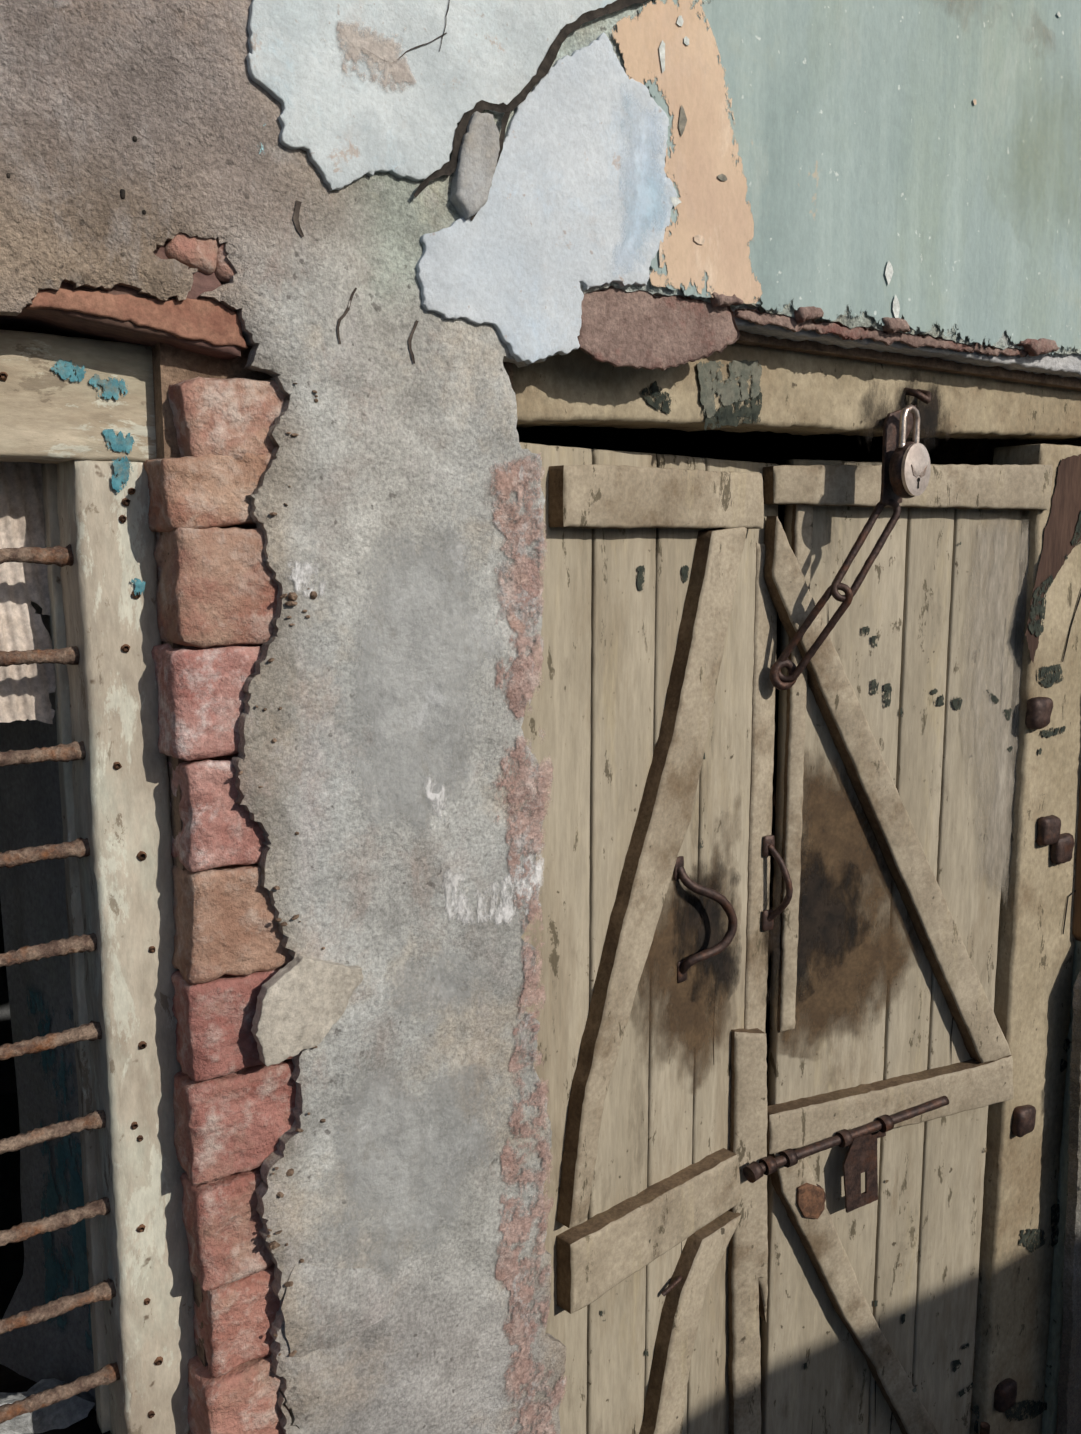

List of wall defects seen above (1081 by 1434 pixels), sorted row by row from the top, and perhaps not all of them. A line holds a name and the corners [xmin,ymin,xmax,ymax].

crack [414,0,648,197]
peeling [246,0,1081,430]
peeling [26,233,247,350]
flaking render [491,453,547,718]
peeling [637,565,645,591]
peeling [1025,454,1081,687]
peeling [871,679,903,717]
peeling [931,688,963,710]
peeling [986,690,1012,721]
peeling [1039,726,1066,755]
flaking render [495,729,567,1434]